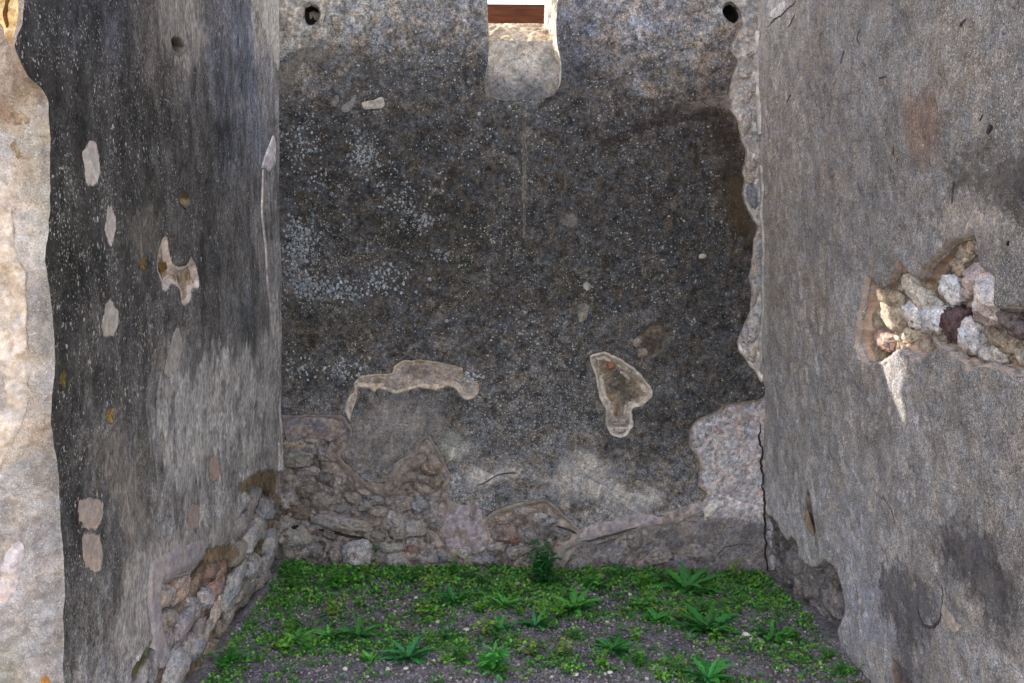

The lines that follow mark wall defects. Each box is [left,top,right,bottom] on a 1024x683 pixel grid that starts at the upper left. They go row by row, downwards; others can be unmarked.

flaking render [148,0,845,683]
flaking render [854,233,1024,377]
crack [716,424,768,571]